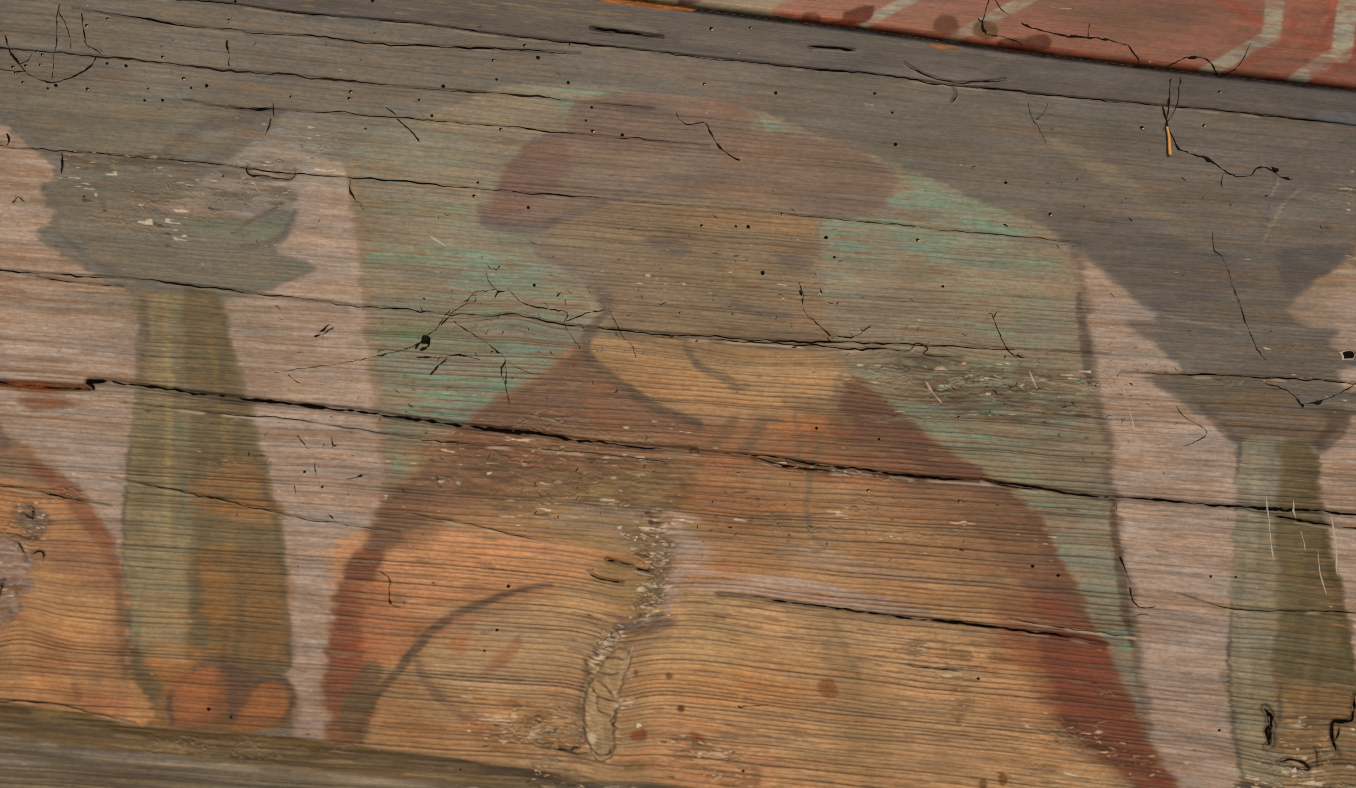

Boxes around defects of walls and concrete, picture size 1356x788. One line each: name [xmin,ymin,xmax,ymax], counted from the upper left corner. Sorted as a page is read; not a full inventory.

crack [0,269,1101,358]
crack [1129,372,1356,385]
crack [0,379,1356,529]
peeling [611,461,676,632]
crack [1264,697,1356,771]